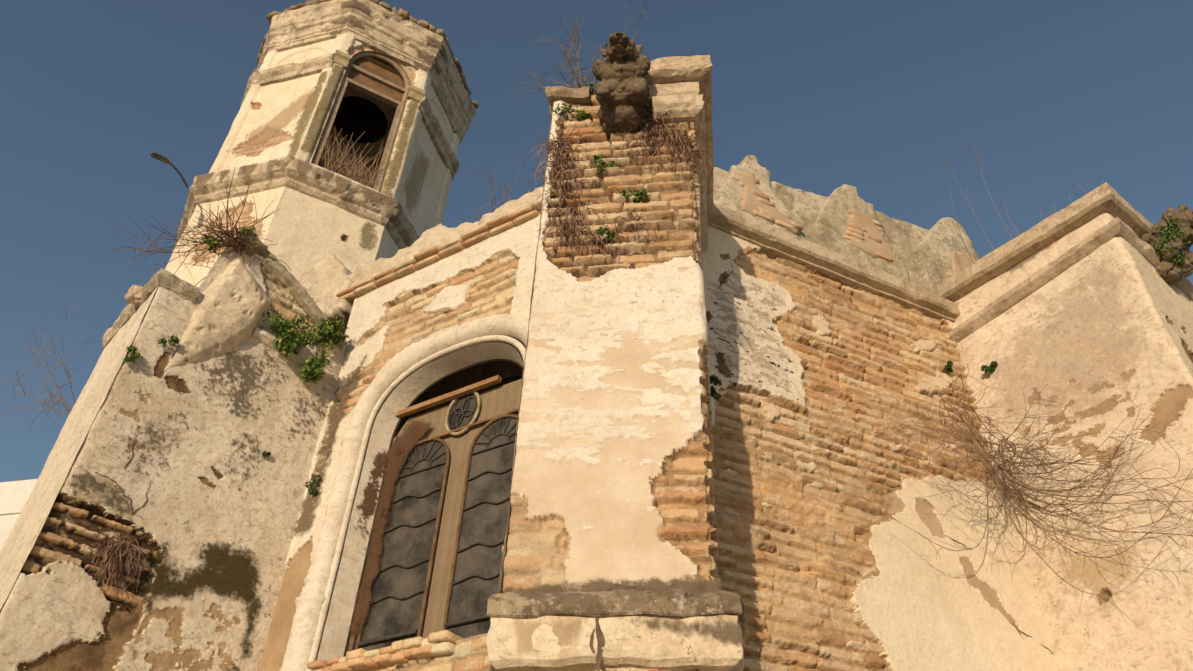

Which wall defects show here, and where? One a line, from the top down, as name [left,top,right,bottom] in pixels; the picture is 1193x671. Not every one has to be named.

flaking render [232,128,294,157]
flaking render [191,200,266,266]
flaking render [154,351,191,395]
flaking render [312,249,520,475]
flaking render [502,91,1001,671]
flaking render [1164,314,1193,363]
flaking render [1023,369,1136,469]
flaking render [1138,384,1193,445]
flaking render [17,473,241,671]
flaking render [357,633,491,671]